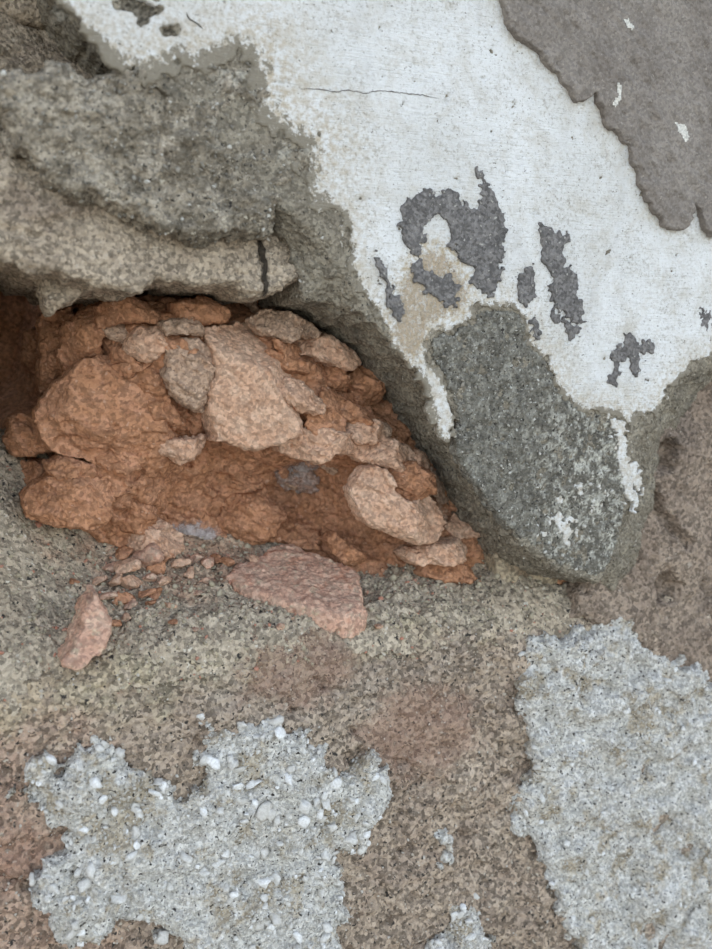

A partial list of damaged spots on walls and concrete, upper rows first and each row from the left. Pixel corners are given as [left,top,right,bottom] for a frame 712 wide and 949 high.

spalling [0,291,485,584]